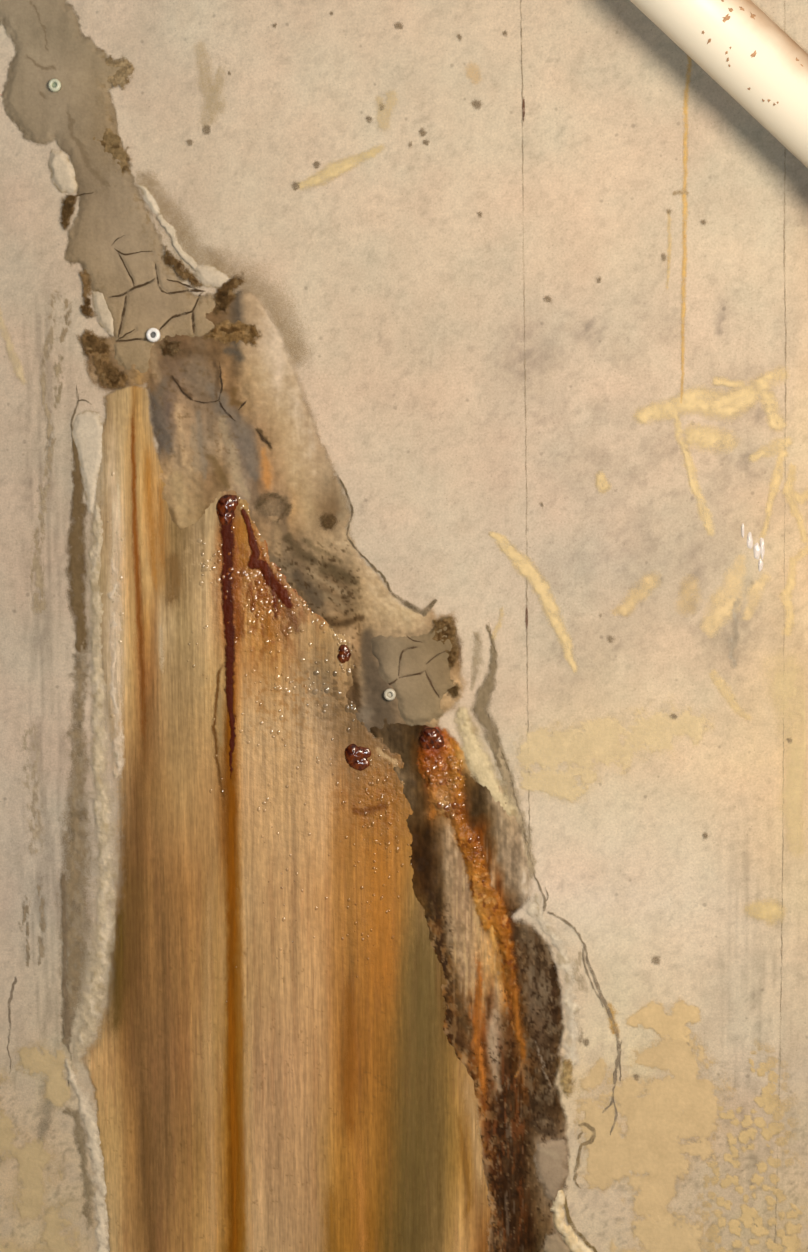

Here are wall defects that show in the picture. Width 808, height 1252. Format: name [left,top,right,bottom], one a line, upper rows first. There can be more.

spalling [105,55,134,90]
peeling [48,149,79,230]
spalling [93,128,132,175]
spalling [78,269,130,389]
crack [110,235,209,342]
spalling [138,184,263,348]
peeling [71,410,104,514]
crack [337,475,447,698]
spalling [430,617,463,699]
rust [80,384,528,1252]
crack [488,714,622,1252]
peeling [550,1189,592,1252]